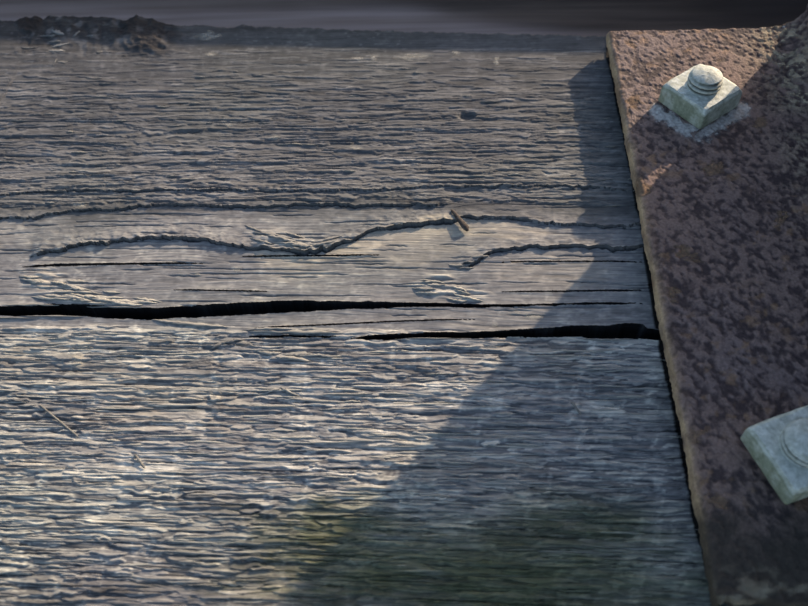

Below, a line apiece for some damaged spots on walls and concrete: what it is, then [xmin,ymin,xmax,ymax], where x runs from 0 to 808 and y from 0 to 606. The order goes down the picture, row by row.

rust [606,45,640,173]
rust [650,104,750,141]
crack [0,183,644,268]
crack [0,289,661,341]
rust [643,247,659,329]
rust [658,339,703,554]